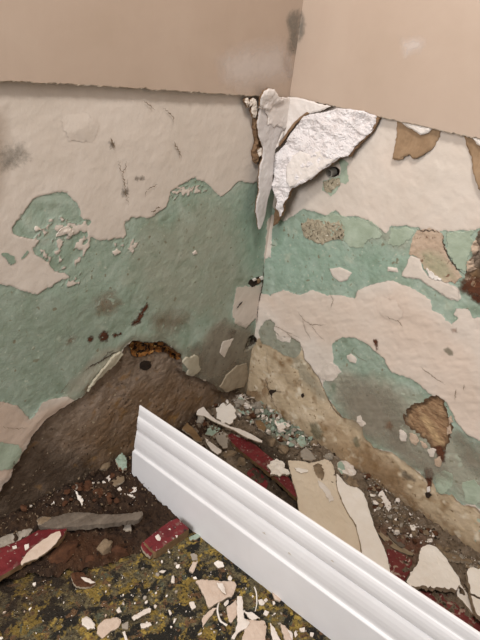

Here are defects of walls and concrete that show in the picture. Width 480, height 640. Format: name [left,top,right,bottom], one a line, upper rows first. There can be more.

peeling [0,88,480,553]